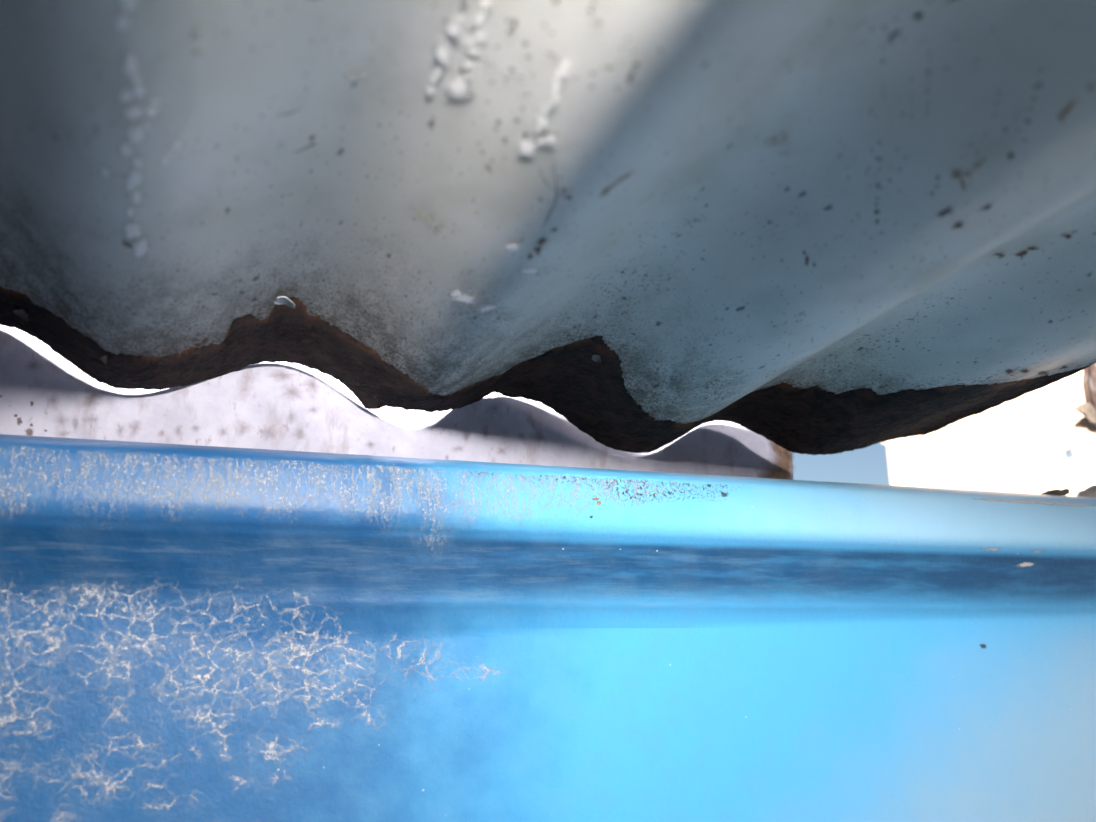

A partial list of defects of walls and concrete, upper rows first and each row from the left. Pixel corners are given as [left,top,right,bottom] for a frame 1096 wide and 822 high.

rust [0,286,1091,480]
damp [0,447,652,539]